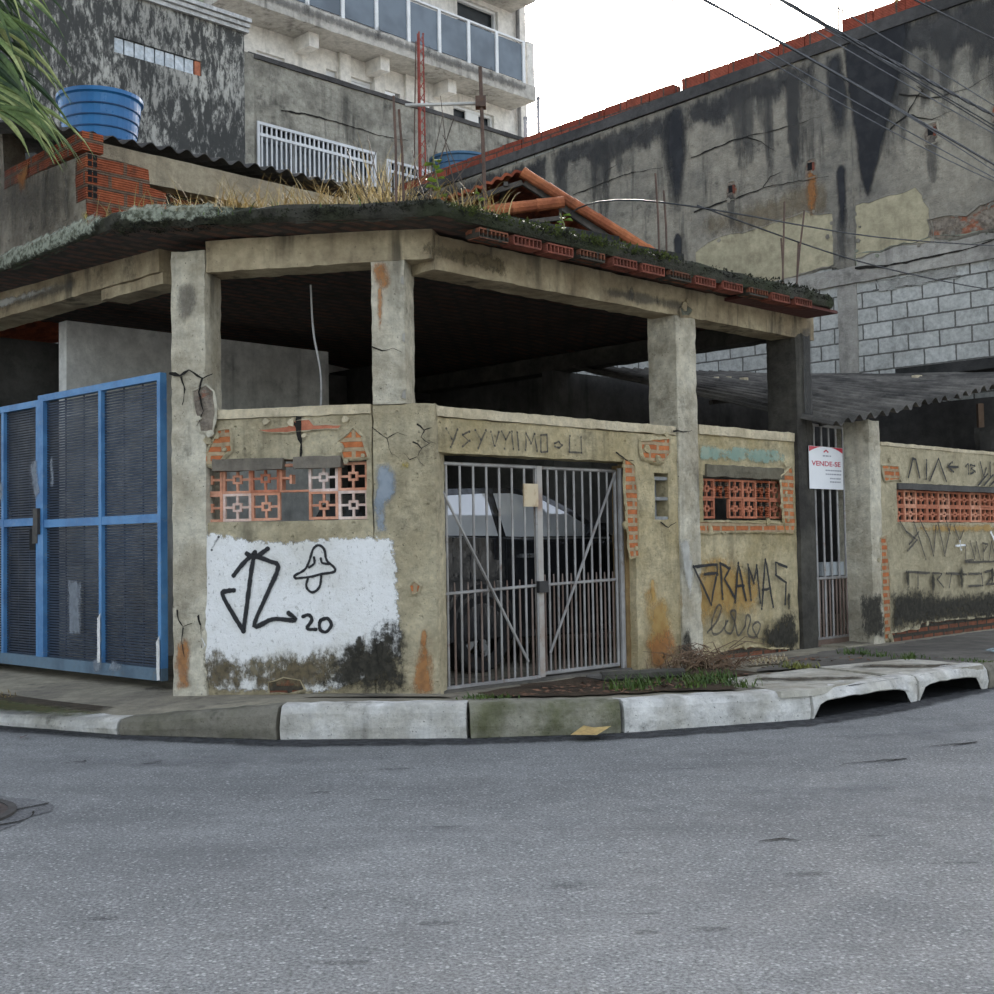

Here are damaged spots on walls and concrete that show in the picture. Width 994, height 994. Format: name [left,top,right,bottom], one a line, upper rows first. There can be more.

damp [421,0,994,202]
crack [889,73,993,130]
crack [691,116,828,213]
damp [836,165,846,256]
peeling [852,186,994,266]
rust [373,264,388,324]
crack [169,370,212,425]
spalling [192,383,234,469]
spalling [622,432,671,561]
damp [860,568,994,637]
damp [204,622,406,692]
rust [414,631,432,694]